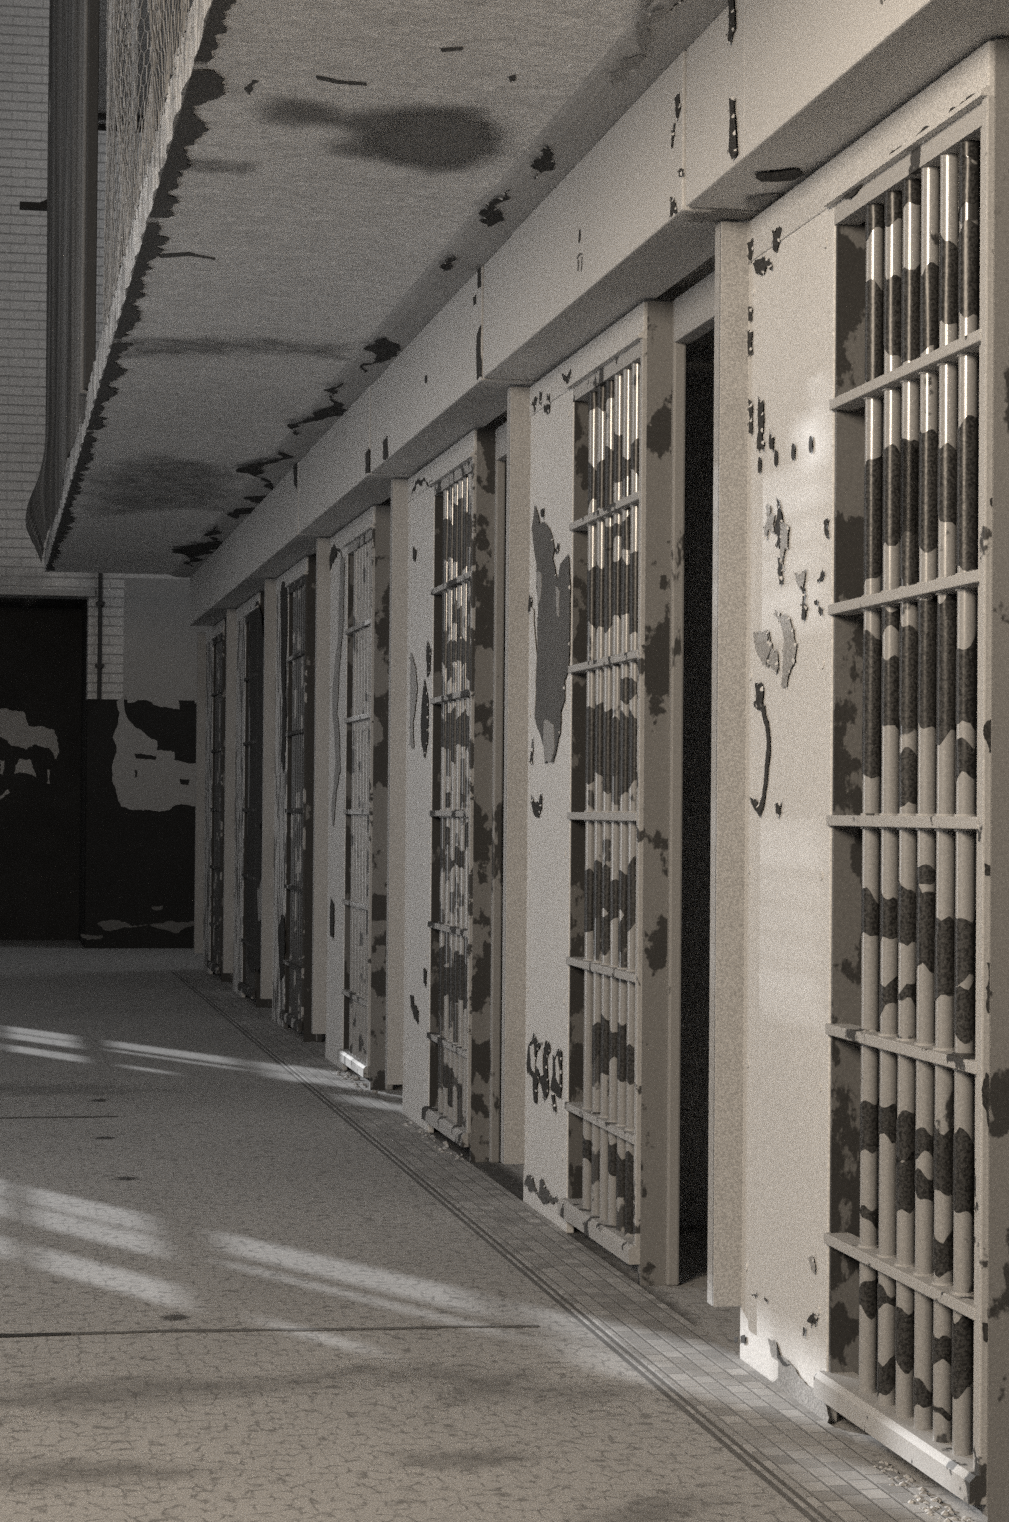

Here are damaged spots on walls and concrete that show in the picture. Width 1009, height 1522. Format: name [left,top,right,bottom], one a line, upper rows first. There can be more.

damp [271,102,491,171]
peeling [0,708,59,799]
peeling [112,692,197,812]
peeling [409,599,471,764]
peeling [443,498,471,576]
peeling [528,505,639,765]
peeling [588,433,639,510]
peeling [753,497,824,687]
peeling [862,594,991,807]
peeling [863,413,992,588]
peeling [861,864,990,1044]
peeling [859,1100,975,1277]